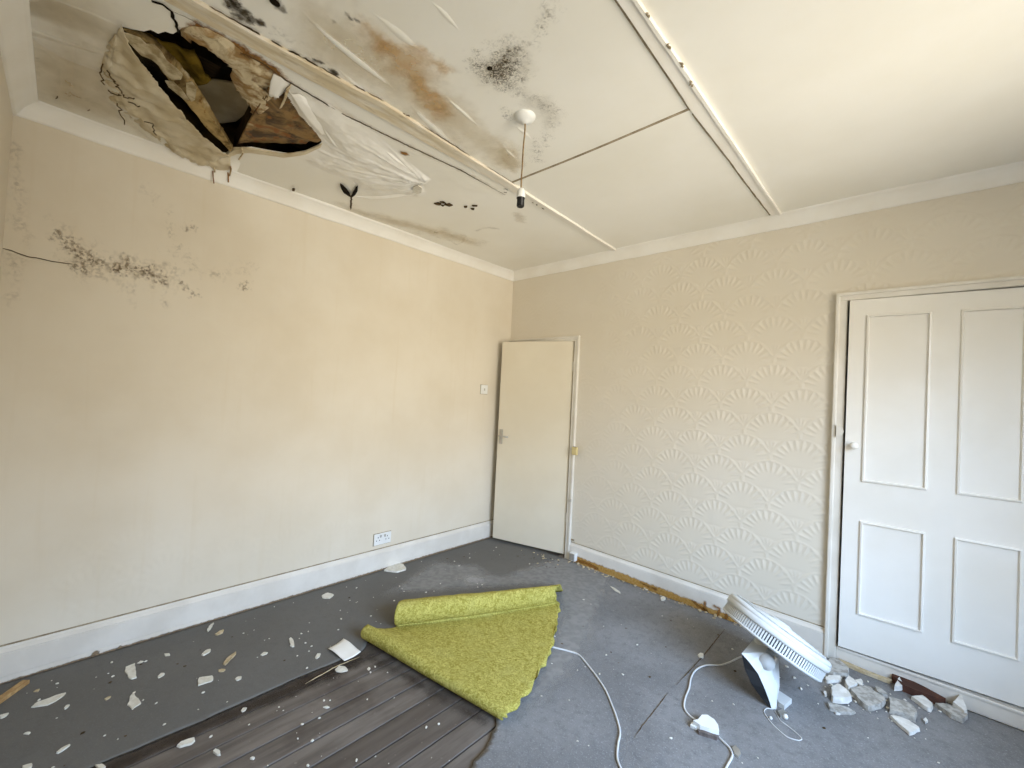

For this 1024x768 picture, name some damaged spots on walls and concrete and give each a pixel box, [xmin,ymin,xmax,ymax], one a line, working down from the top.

peeling [210,6,340,79]
mould [478,50,516,87]
crack [2,248,77,265]